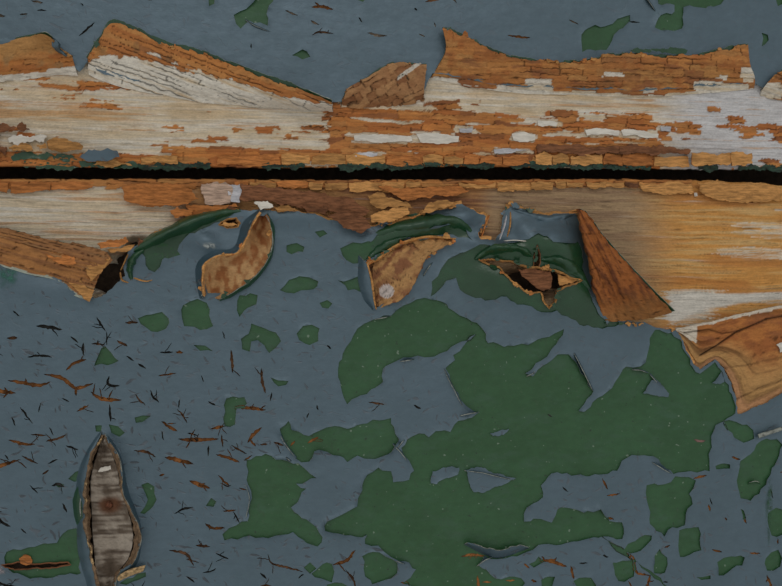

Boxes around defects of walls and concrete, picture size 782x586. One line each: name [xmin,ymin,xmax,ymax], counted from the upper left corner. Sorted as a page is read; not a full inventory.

peeling [234,0,273,32]
peeling [648,0,723,31]
peeling [354,128,473,157]
peeling [494,121,558,154]
peeling [585,126,671,138]
peeling [143,208,231,272]
peeling [138,312,169,332]
peeling [181,299,213,330]
crack [0,316,323,512]
peeling [222,225,782,586]
peeling [4,528,80,579]
crack [169,508,239,582]